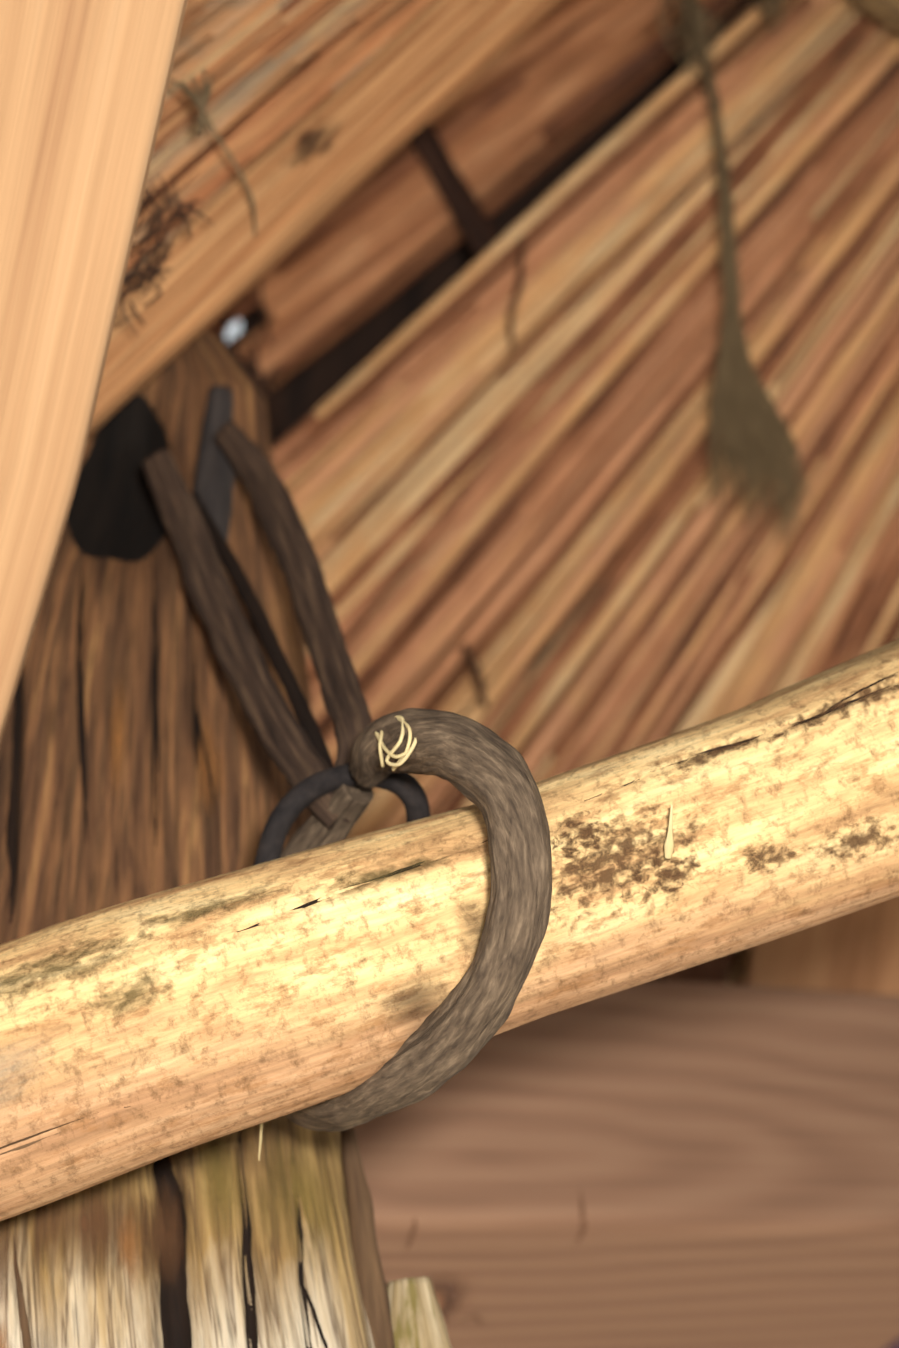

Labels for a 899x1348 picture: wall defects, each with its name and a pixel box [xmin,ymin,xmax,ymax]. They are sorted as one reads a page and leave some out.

crack [687,673,896,762]
mould [551,807,699,913]
crack [0,1106,131,1155]
crack [153,1156,192,1348]
crack [238,1131,258,1348]
crack [291,1145,328,1348]